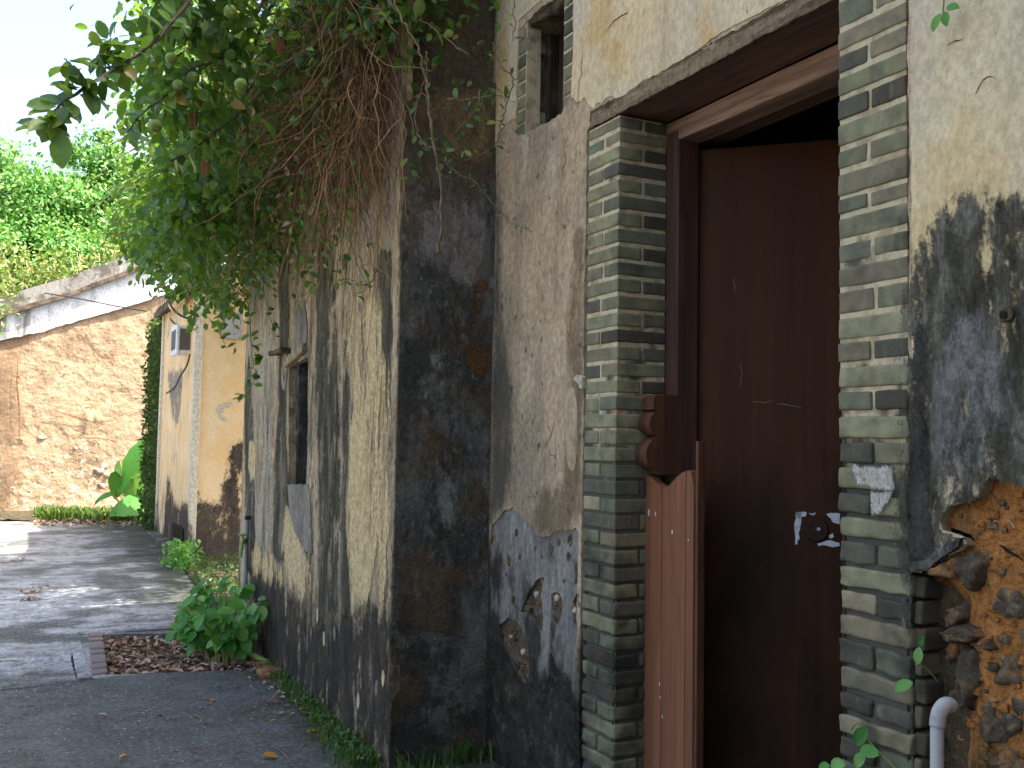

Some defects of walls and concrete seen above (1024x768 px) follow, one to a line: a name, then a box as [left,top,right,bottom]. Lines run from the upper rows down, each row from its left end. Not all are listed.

leakage [164,199,583,768]
flaking render [490,508,578,694]
leakage [892,191,1024,637]
flaking render [911,479,1024,768]